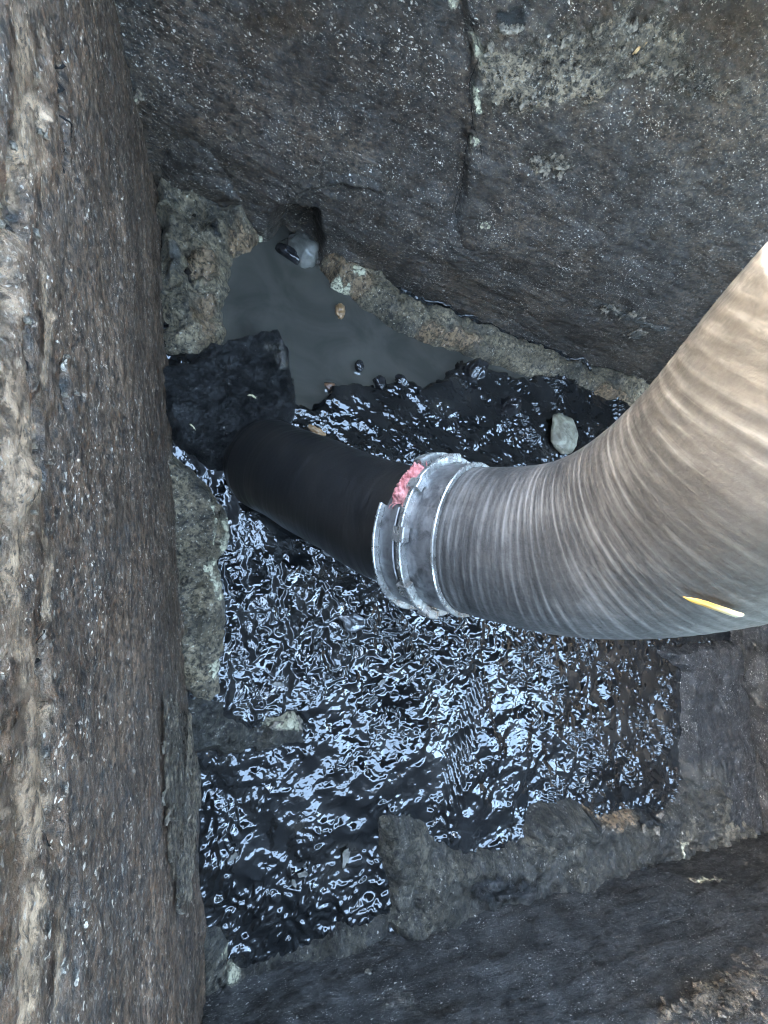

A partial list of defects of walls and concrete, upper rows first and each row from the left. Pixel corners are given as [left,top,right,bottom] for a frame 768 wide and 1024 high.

crack [449,14,482,239]